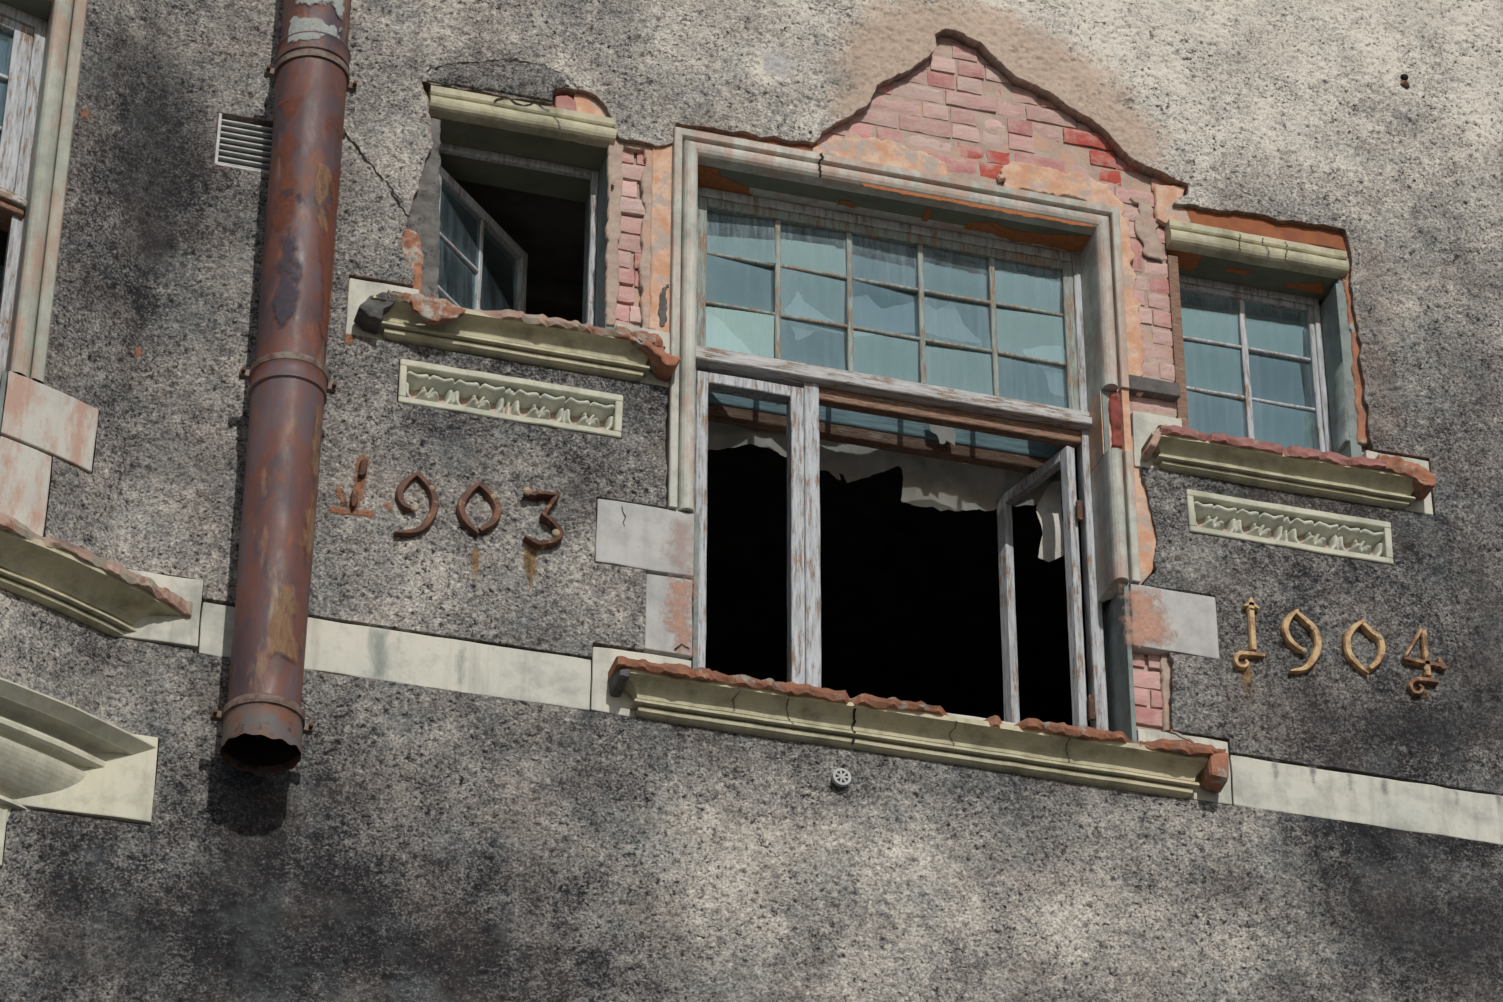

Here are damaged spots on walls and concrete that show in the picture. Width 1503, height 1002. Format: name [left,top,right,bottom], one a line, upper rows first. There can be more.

spalling [608,522,949,716]
flaking render [686,37,1436,793]